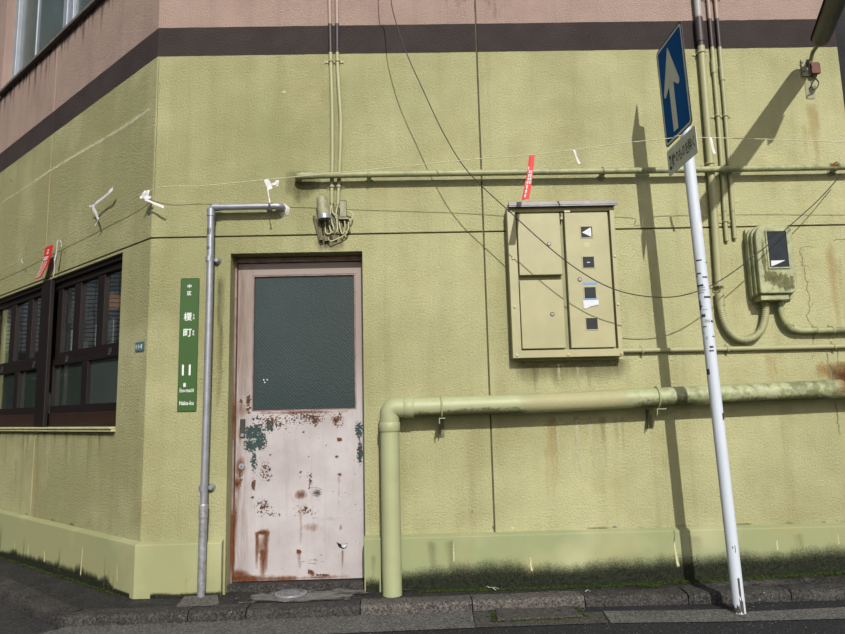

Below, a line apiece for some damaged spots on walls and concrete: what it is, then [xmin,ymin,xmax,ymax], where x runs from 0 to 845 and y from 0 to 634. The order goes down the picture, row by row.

crack [799,246,838,380]
rust [829,365,845,391]
damp [0,550,129,598]
damp [366,577,382,593]
damp [402,556,729,592]
damp [740,547,845,577]